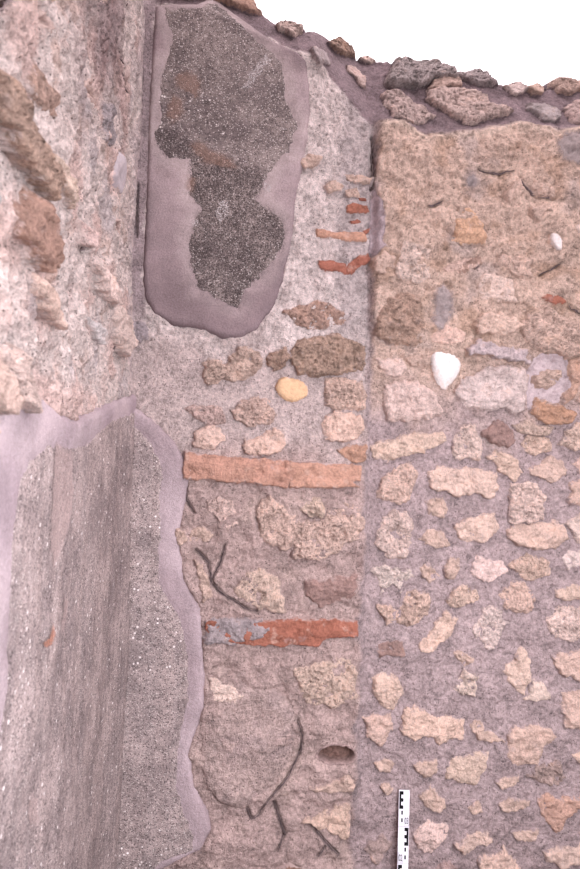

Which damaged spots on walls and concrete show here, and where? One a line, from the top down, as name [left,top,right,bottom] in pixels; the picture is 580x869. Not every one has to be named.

crack [195,544,258,612]
crack [247,721,303,852]
crack [315,828,339,857]